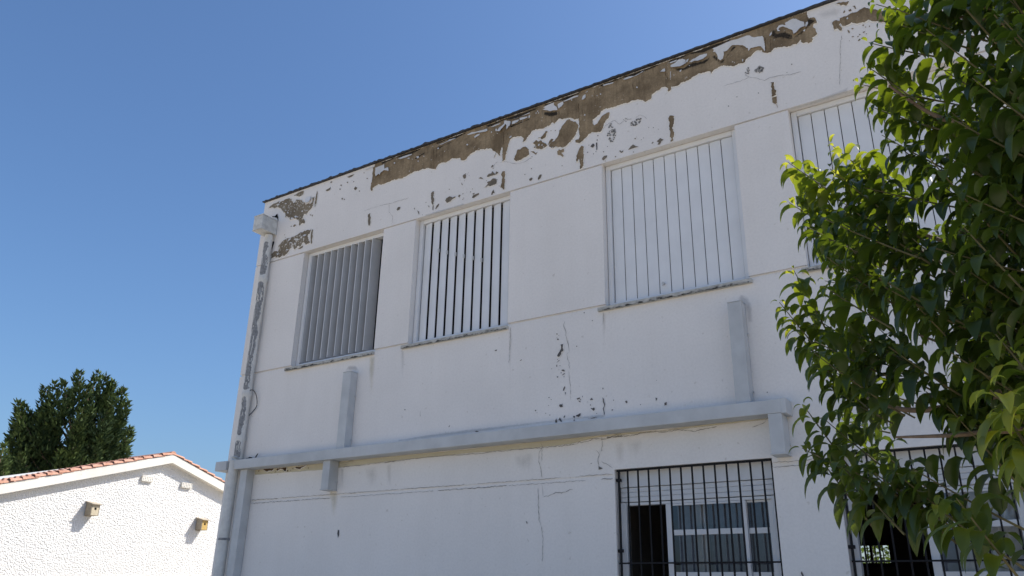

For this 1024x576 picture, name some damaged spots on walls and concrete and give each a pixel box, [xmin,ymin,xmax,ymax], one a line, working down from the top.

peeling [234,12,818,458]
crack [253,388,717,559]